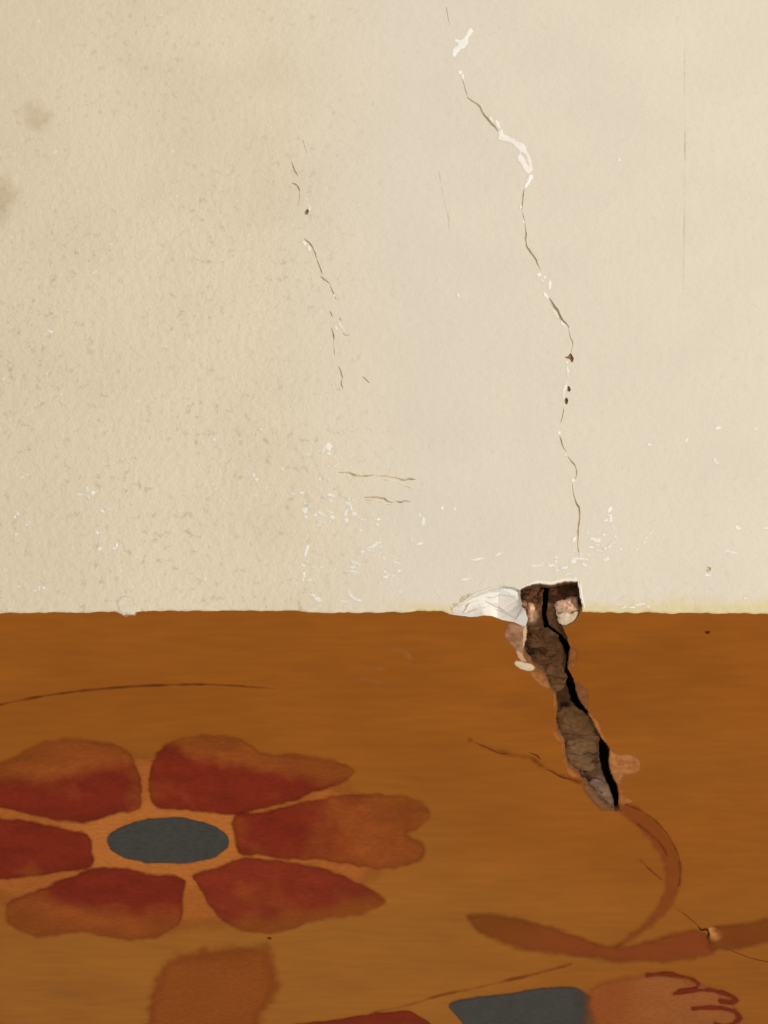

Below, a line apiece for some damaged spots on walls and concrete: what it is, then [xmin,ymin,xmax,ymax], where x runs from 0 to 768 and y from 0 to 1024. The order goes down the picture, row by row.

crack [457,70,500,131]
crack [519,190,580,554]
spalling [449,585,528,627]